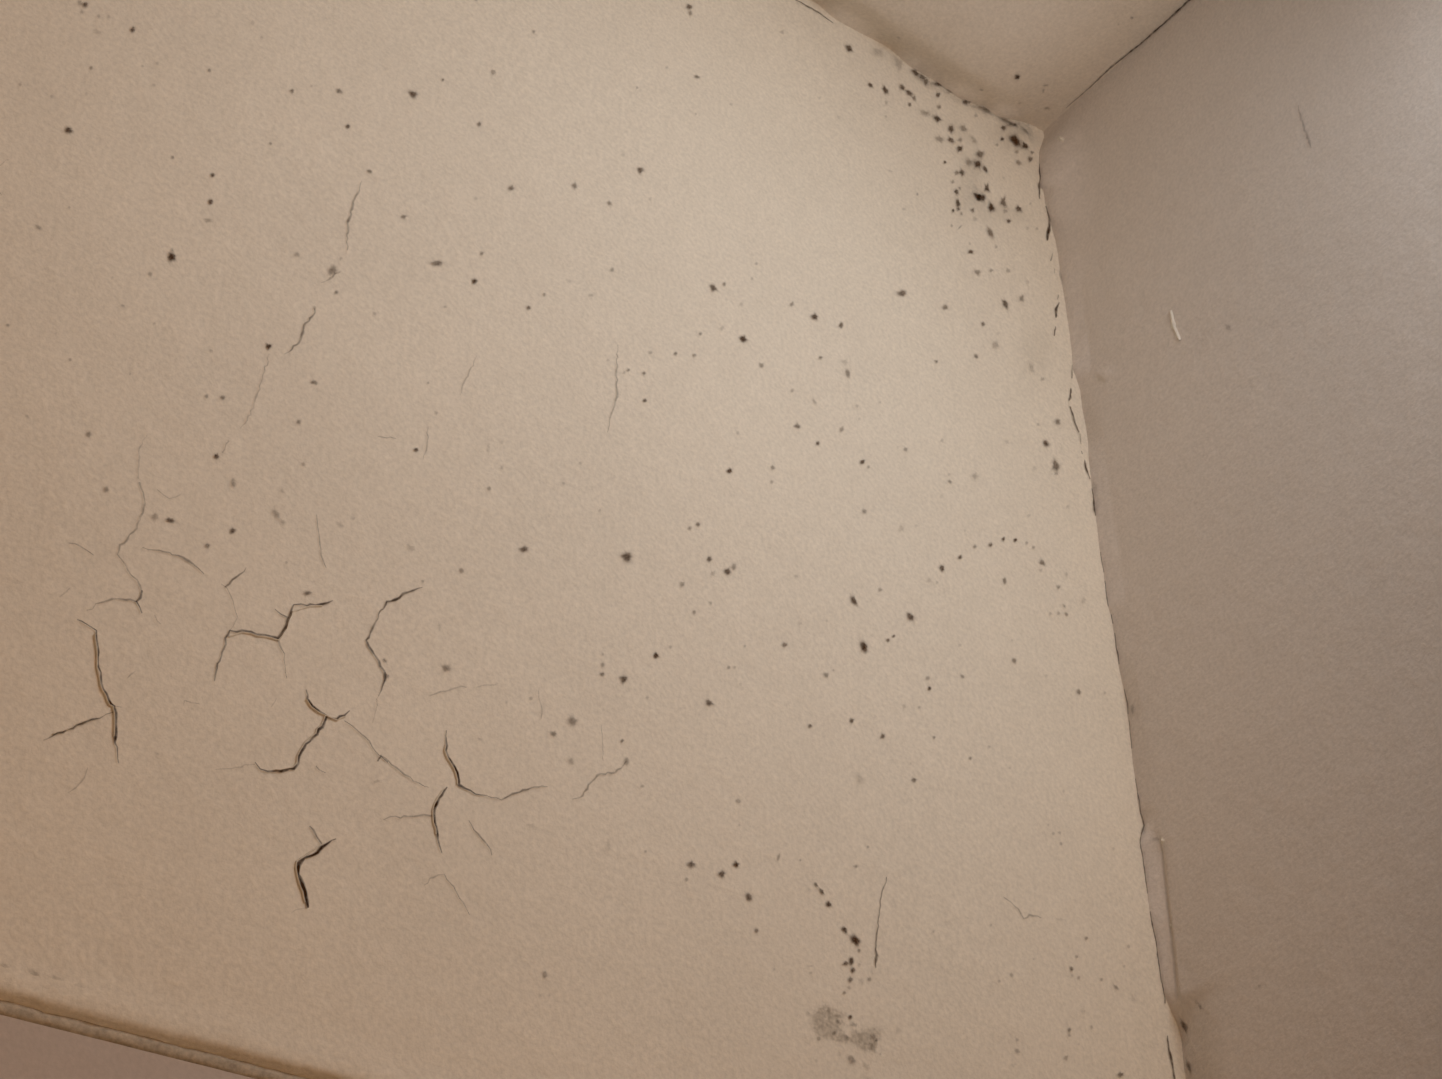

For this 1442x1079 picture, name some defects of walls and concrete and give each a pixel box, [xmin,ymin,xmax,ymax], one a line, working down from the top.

damp [952,152,1021,222]
crack [215,601,331,675]
crack [366,589,416,691]
crack [51,620,118,758]
crack [257,691,350,772]
crack [431,730,528,852]
crack [295,830,335,908]